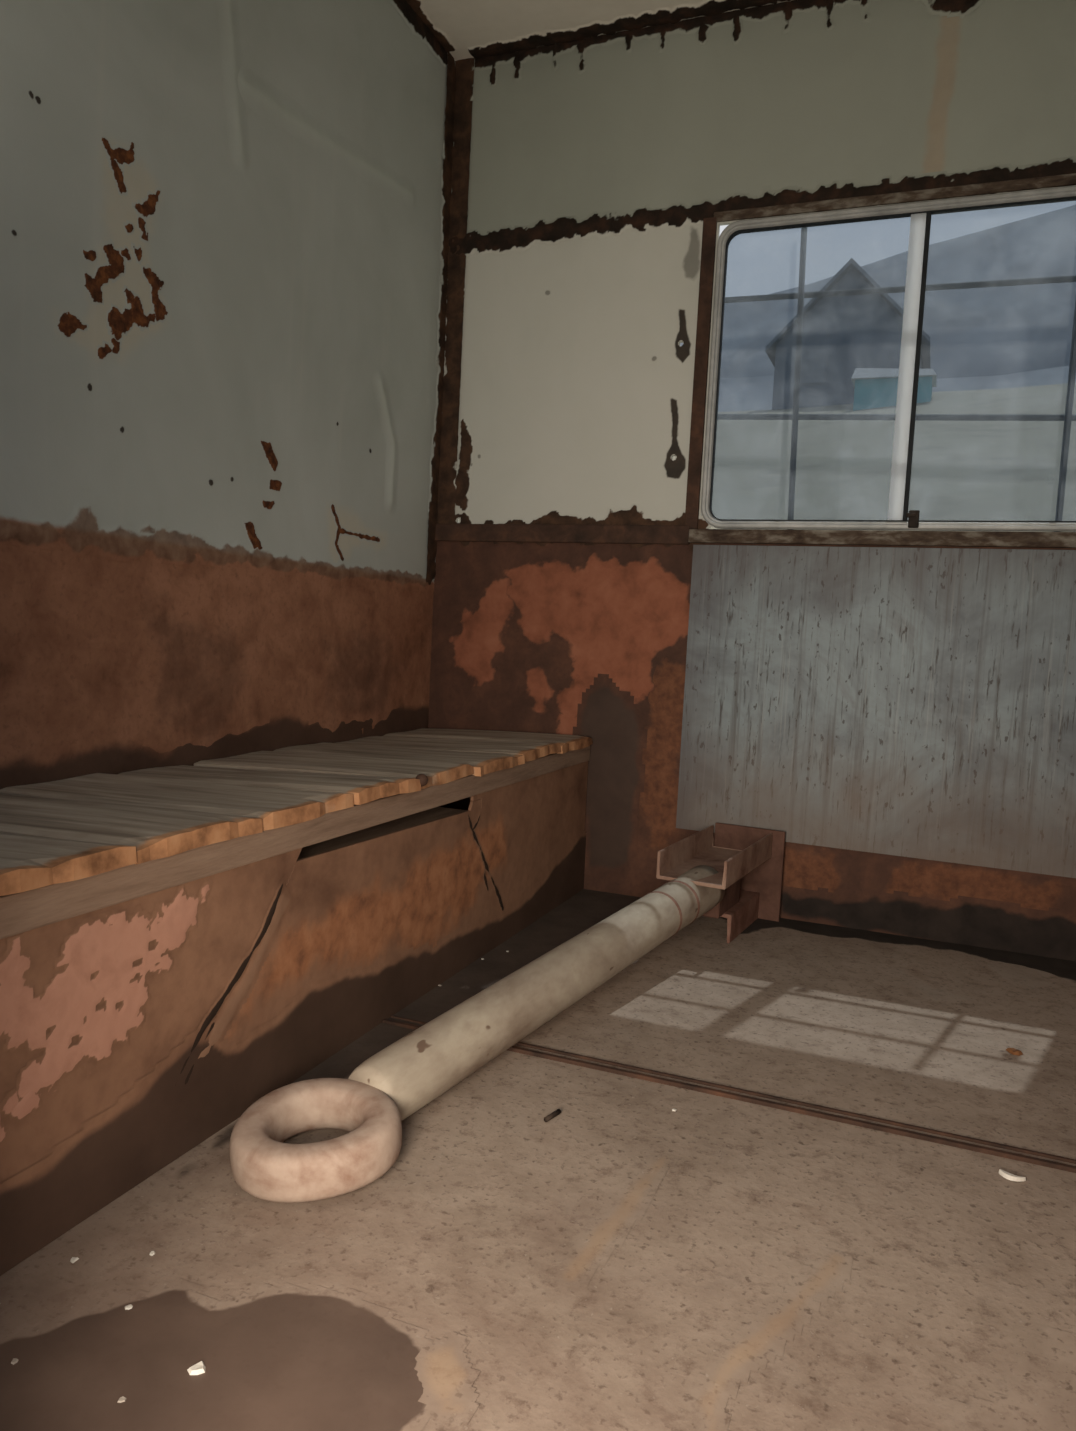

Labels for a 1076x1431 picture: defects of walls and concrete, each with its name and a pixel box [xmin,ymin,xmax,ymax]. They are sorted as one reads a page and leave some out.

rust [27,88,42,108]
rust [384,0,1076,586]
rust [637,650,690,861]
peeling [0,879,212,1147]
crack [180,879,292,1085]
rust [782,842,849,893]
rust [876,854,1076,911]
water stain [0,1278,433,1431]